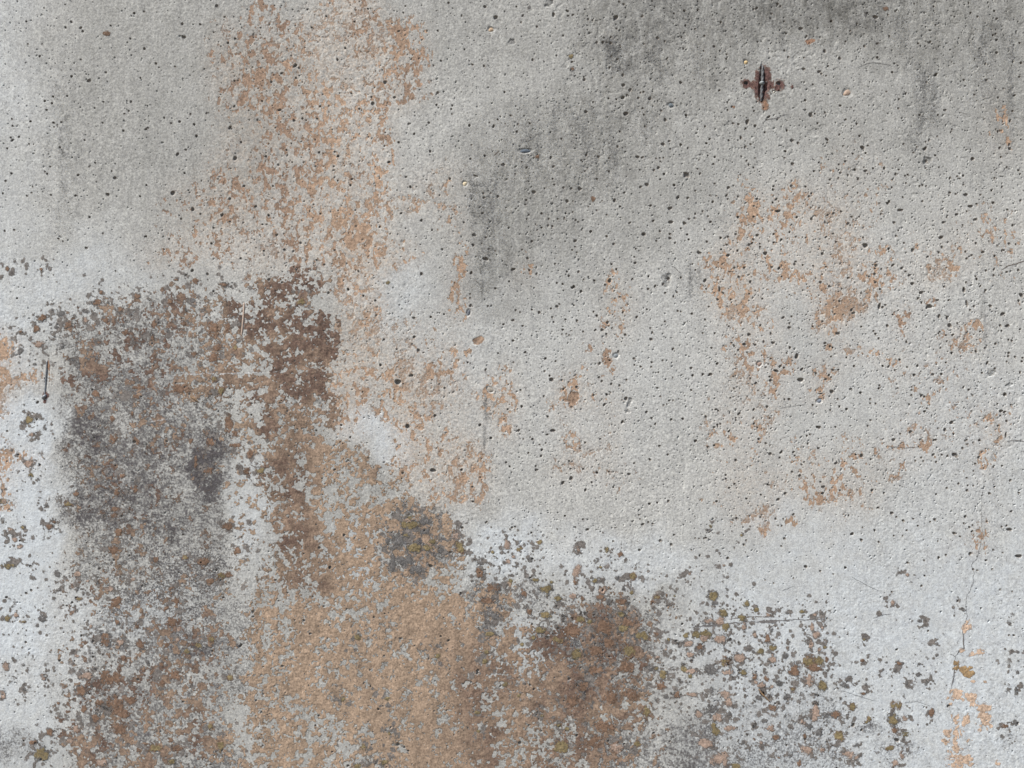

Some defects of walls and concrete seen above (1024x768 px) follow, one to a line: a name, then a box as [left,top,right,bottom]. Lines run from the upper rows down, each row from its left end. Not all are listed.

corrosion [740,65,794,110]
peeling [147,0,518,511]
peeling [585,343,616,377]
peeling [600,269,631,337]
spalling [546,365,620,494]
water stain [49,264,682,768]